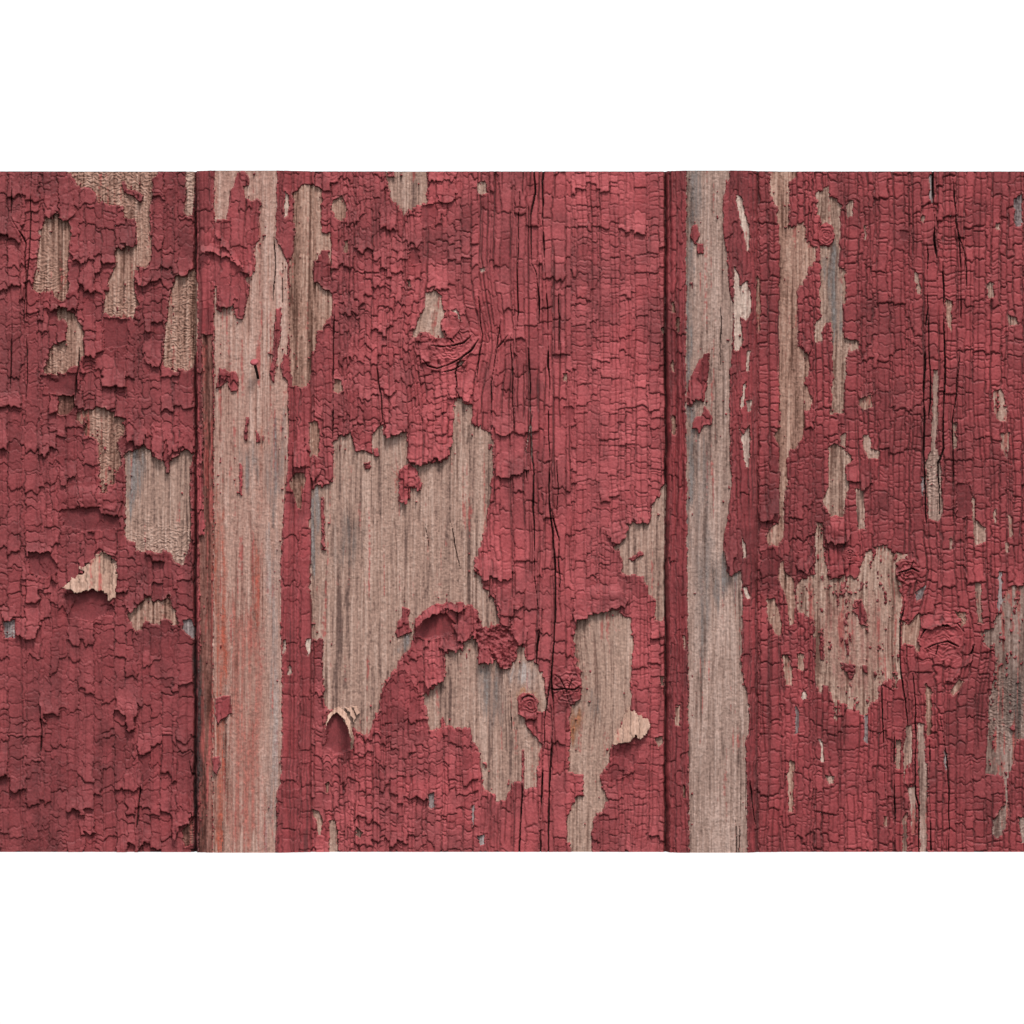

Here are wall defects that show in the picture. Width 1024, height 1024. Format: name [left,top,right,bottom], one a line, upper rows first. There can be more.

peeling [33,171,158,376]
peeling [58,171,547,853]
crack [424,171,579,852]
peeling [566,590,663,852]
peeling [661,171,761,853]
peeling [759,171,858,547]
peeling [766,433,1024,852]
crack [923,171,967,524]